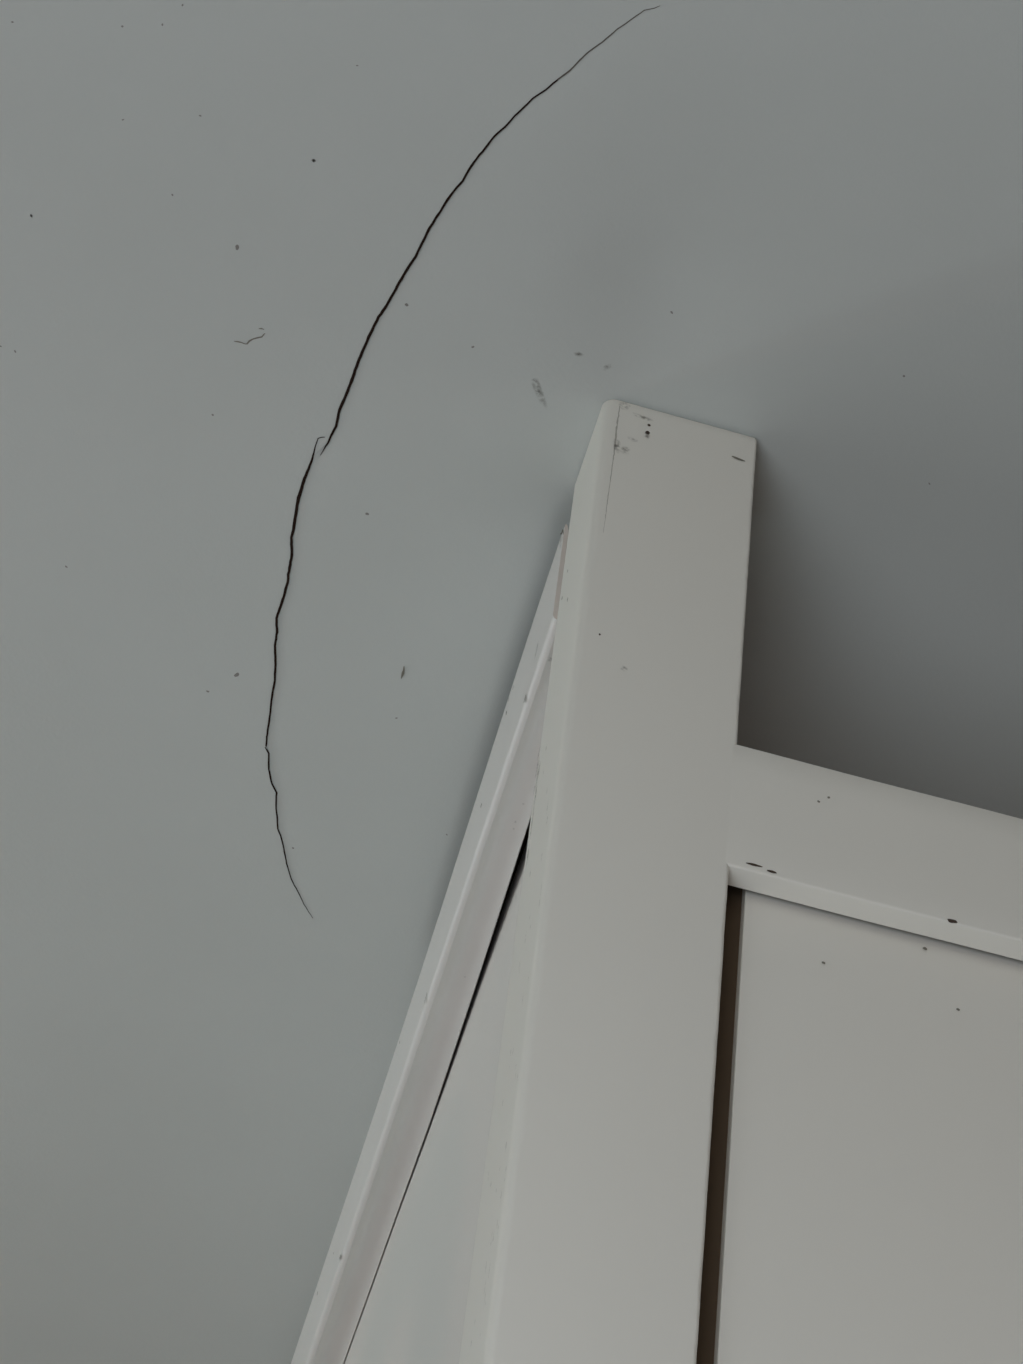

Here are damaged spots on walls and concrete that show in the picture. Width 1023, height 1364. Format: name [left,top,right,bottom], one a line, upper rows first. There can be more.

crack [265,6,659,918]